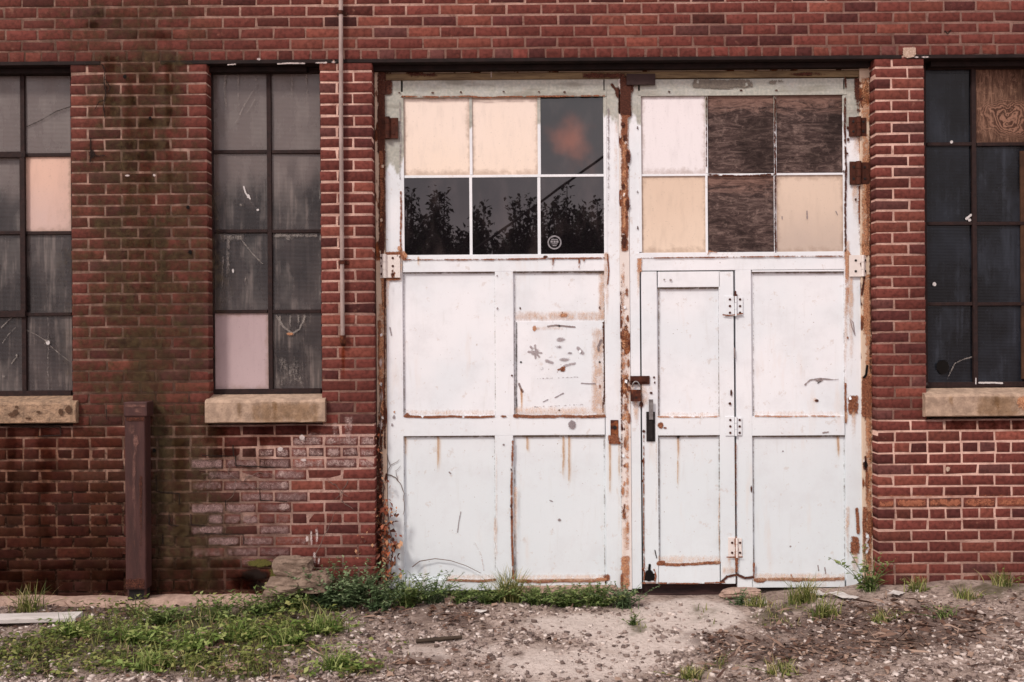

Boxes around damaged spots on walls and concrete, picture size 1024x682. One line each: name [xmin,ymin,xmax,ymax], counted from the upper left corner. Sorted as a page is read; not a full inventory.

water stain [75,48,208,498]
rust [376,72,639,581]
peeling [511,322,584,414]
rust [608,376,656,447]
rust [637,77,873,576]
water stain [192,419,373,591]
rust [510,416,845,589]